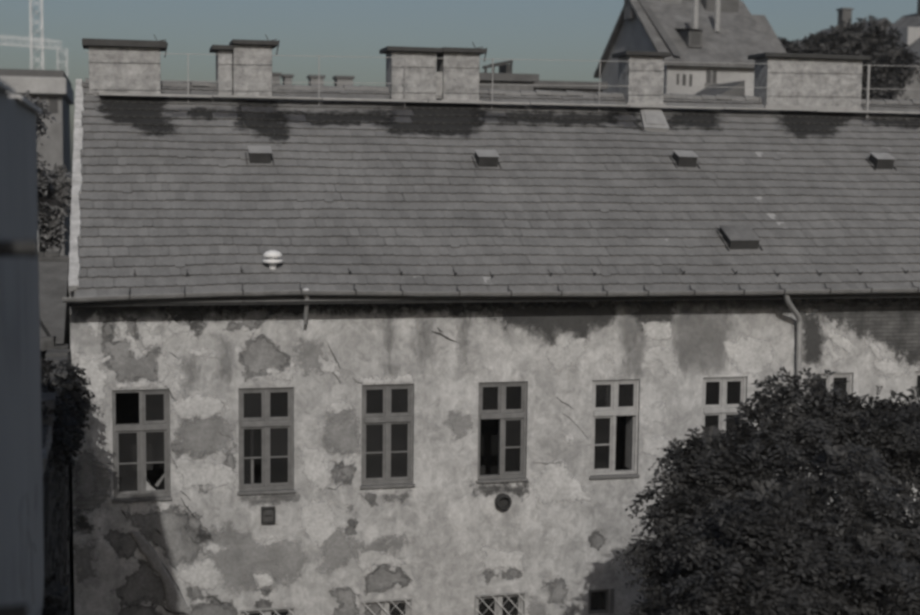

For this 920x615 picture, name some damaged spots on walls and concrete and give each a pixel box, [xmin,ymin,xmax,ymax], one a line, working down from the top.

leakage [72,306,170,320]
leakage [196,298,920,365]
flaking render [546,334,590,375]
flaking render [641,322,682,382]
flaking render [722,337,773,376]
flaking render [444,411,473,439]
flaking render [74,305,415,615]
flaking render [479,459,592,504]
flaking render [66,462,111,614]
flaking render [588,531,606,551]
flaking render [481,546,524,582]
flaking render [529,579,568,615]